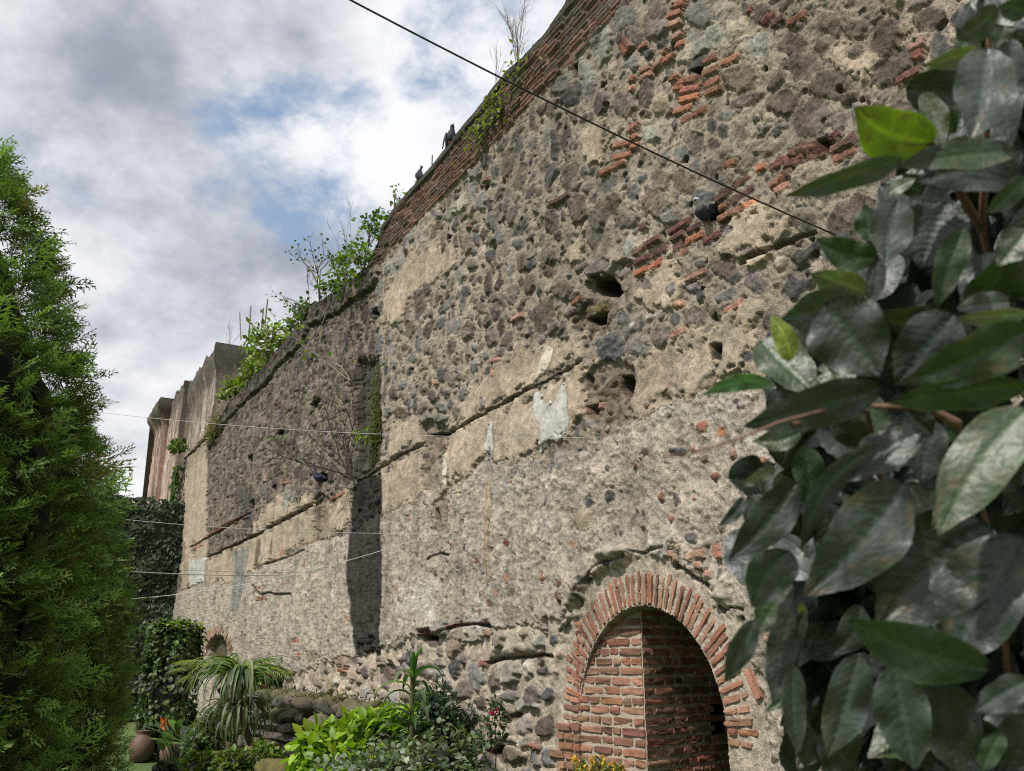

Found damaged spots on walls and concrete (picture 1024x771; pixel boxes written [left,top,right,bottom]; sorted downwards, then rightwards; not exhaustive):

crack [449,361,582,436]
peeling [532,382,569,452]
crack [359,444,425,482]
crack [191,504,318,558]
crack [417,621,492,639]